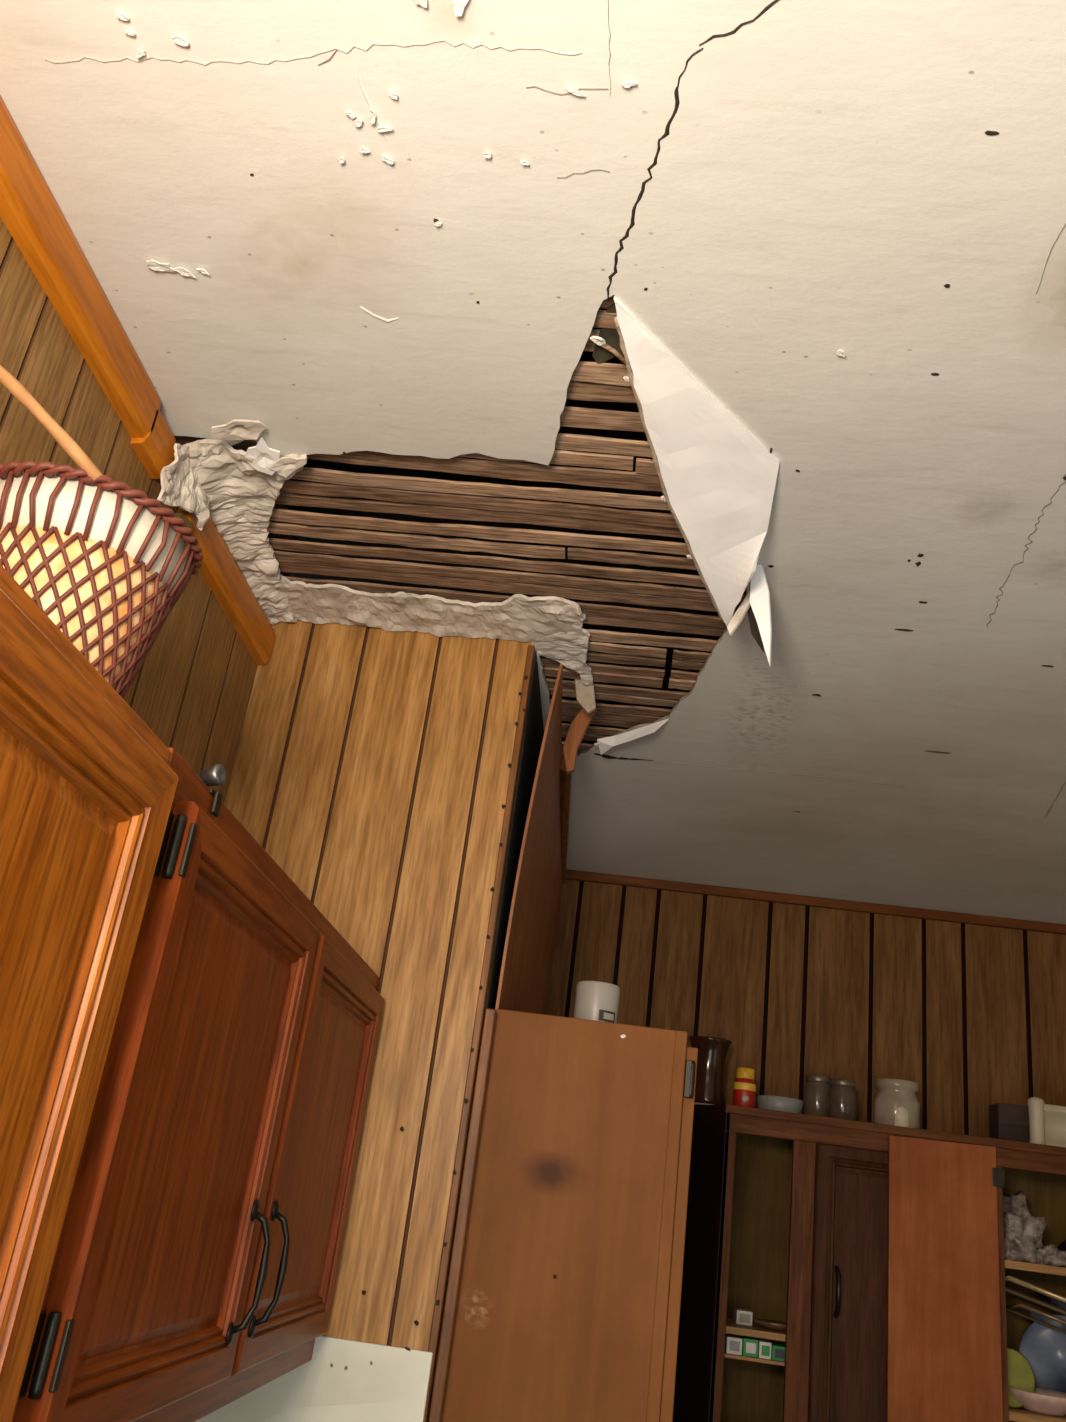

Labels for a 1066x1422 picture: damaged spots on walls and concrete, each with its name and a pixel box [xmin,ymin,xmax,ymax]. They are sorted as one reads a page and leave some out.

crack [557,169,610,178]
crack [607,0,778,302]
crack [987,474,1066,625]
flaking render [277,574,596,714]
flaking render [594,719,668,755]